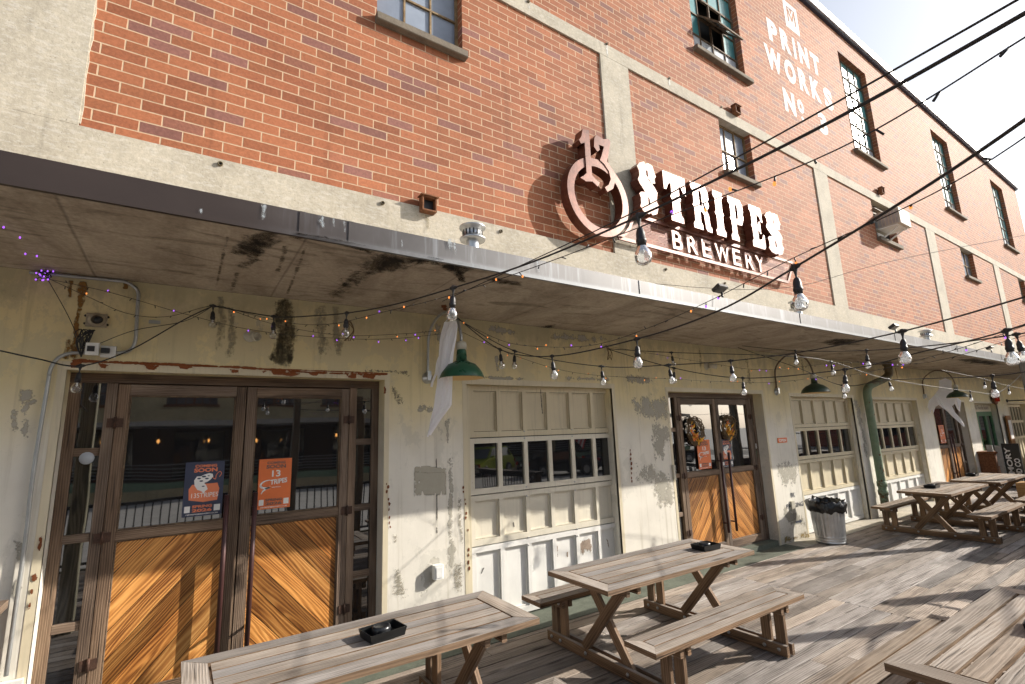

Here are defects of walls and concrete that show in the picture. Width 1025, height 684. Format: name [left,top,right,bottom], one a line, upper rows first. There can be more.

corrosion [64,281,87,359]
damp [231,232,280,266]
damp [270,299,295,366]
damp [296,217,470,353]
peeling [11,390,37,438]
peeling [632,397,674,508]
spalling [414,459,456,572]